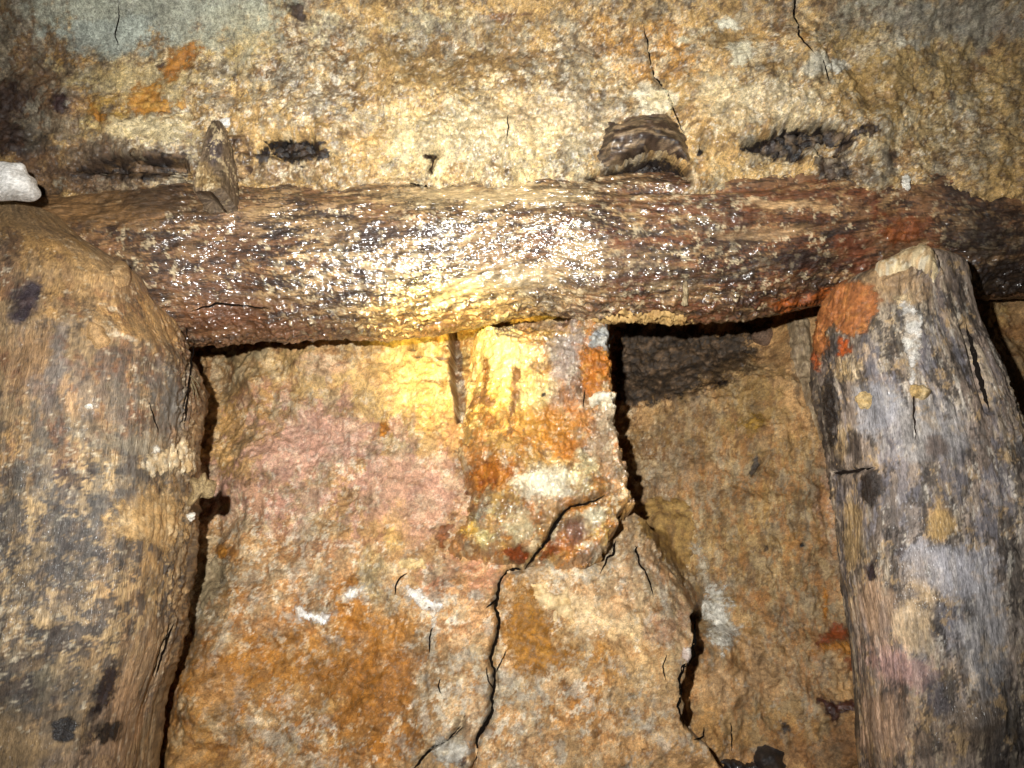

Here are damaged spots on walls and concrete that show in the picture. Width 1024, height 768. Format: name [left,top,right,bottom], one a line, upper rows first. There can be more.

rust [579,346,616,408]
rust [768,278,883,370]
damp [895,294,923,385]
rust [465,460,513,497]
rust [504,545,556,565]
crack [600,541,653,594]
crack [414,495,605,768]
crack [662,621,705,740]